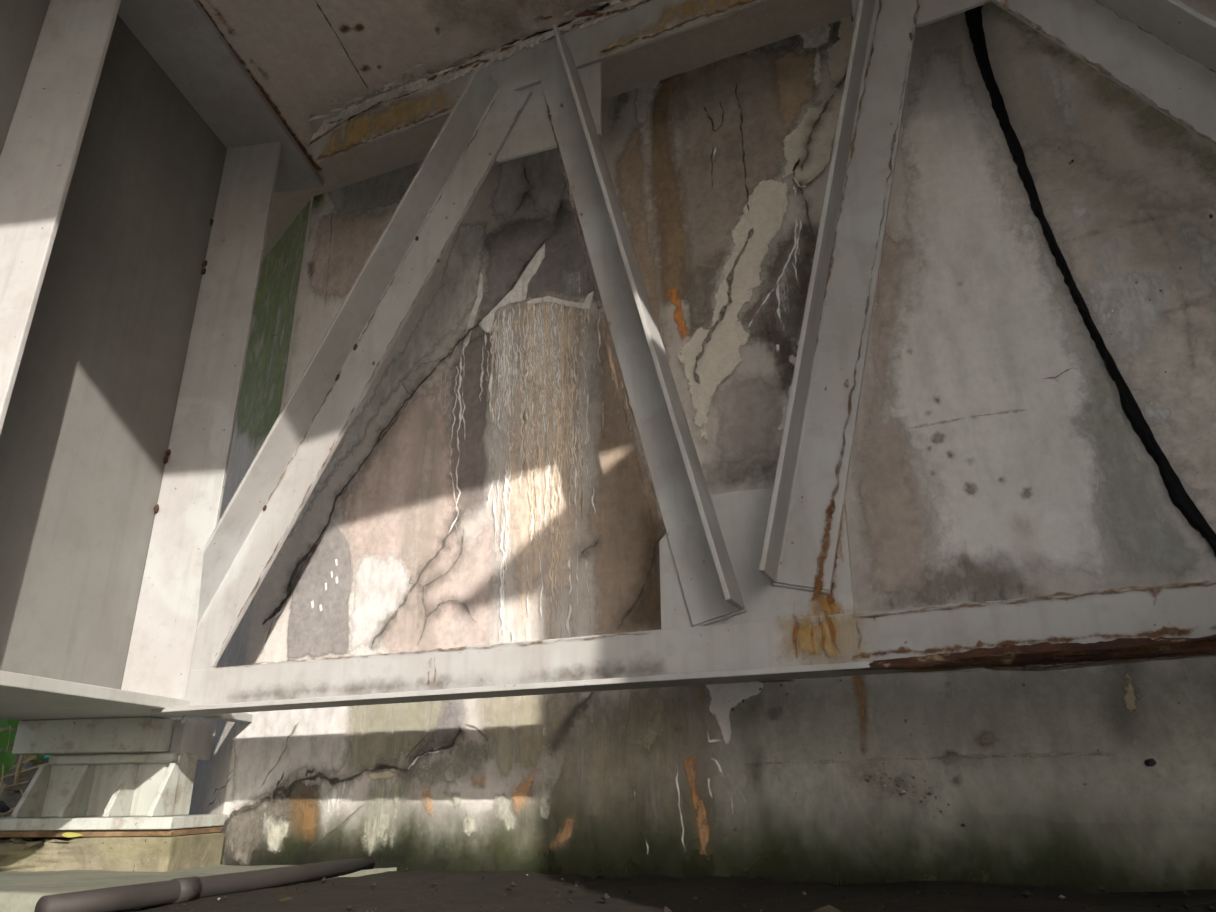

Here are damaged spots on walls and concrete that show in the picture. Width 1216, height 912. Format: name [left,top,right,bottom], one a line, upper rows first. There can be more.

peeling [308,0,650,147]
peeling [677,16,854,441]
corrosion [824,0,882,298]
water stain [343,208,664,653]
corrosion [792,267,873,658]
crack [207,724,488,850]
water stain [220,656,1216,886]
peeling [706,682,764,744]
corrosion [853,627,1216,673]